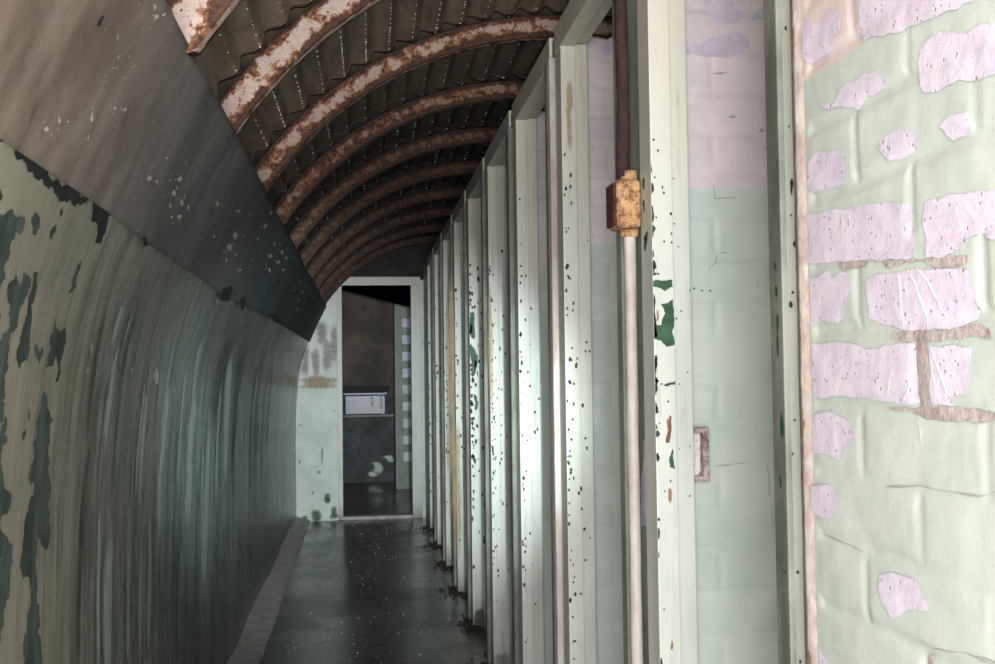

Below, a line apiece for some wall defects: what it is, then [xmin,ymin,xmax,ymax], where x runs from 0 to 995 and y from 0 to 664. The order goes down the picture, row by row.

peeling [858,0,975,42]
peeling [918,23,995,93]
peeling [819,72,887,110]
peeling [878,129,917,161]
peeling [939,112,970,141]
peeling [807,150,846,192]
peeling [653,251,682,347]
peeling [0,207,66,664]
peeling [640,355,691,526]
peeling [812,412,855,460]
crack [885,485,995,497]
peeling [878,572,929,619]